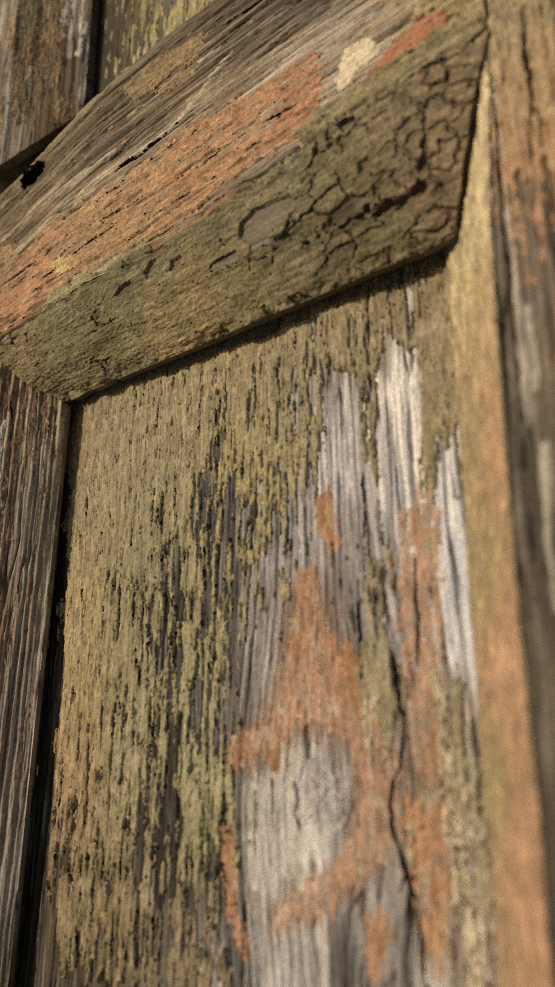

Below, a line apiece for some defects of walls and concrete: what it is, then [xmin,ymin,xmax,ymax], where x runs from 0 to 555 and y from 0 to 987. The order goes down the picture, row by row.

peeling [0,0,555,401]
crack [355,601,363,655]
peeling [263,741,283,776]
crack [360,473,429,987]
peeling [247,790,257,852]
peeling [159,824,172,894]
peeling [361,902,397,986]